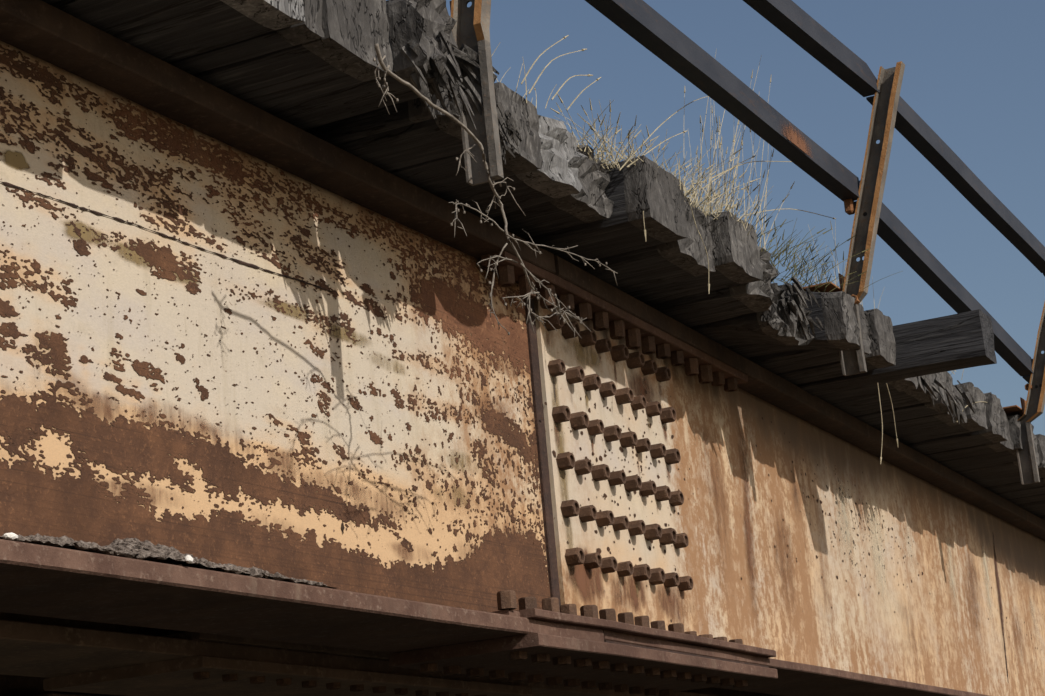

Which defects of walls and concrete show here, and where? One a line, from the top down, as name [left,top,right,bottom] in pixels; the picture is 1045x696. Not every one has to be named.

peeling [4,150,30,170]
crack [0,181,333,292]
rust [0,44,556,612]
rust [580,377,674,439]
rust [570,430,690,481]
rust [569,485,653,600]
rust [614,576,647,609]